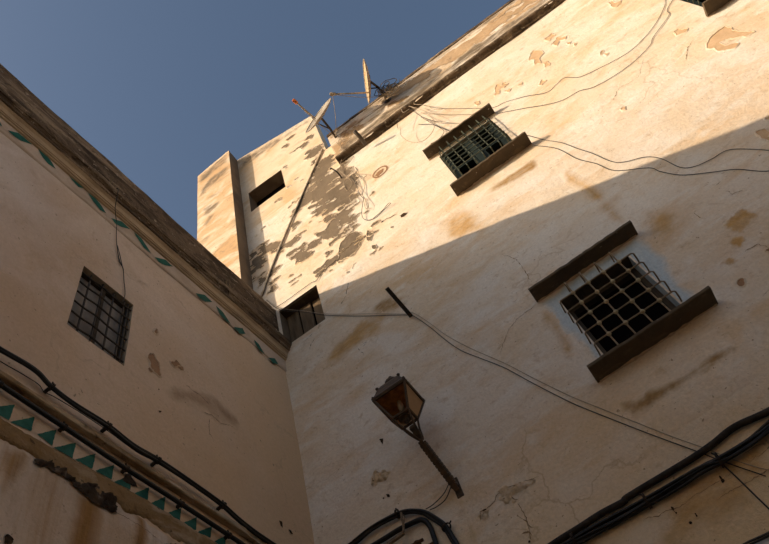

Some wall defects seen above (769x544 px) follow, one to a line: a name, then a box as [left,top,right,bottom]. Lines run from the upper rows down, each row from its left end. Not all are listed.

peeling [381,0,540,112]
peeling [528,33,578,68]
peeling [705,26,756,52]
peeling [249,114,394,295]
peeling [146,352,184,378]
water stain [324,310,391,368]
water stain [619,345,740,419]
spalling [34,458,118,513]
crack [480,476,539,539]